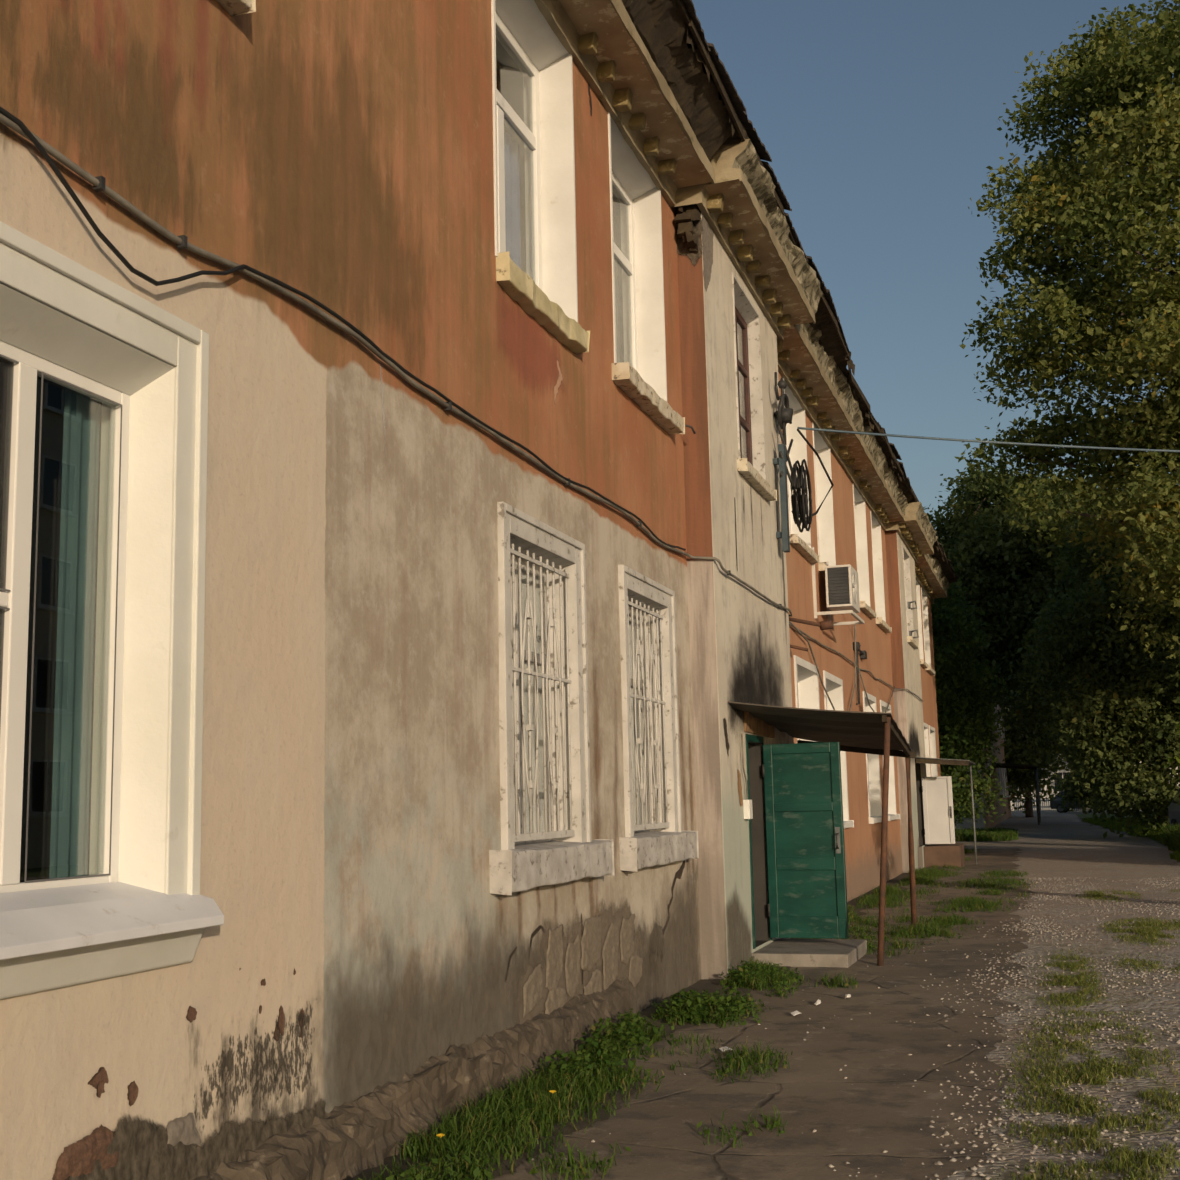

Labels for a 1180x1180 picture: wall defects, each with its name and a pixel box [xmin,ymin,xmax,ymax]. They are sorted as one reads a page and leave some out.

peeling [88,1067,109,1098]
flaking render [52,1081,326,1180]
peeling [186,1006,197,1023]
water stain [194,941,544,1129]
flaking render [514,903,644,1024]
water stain [618,881,699,1014]
crack [650,860,685,973]